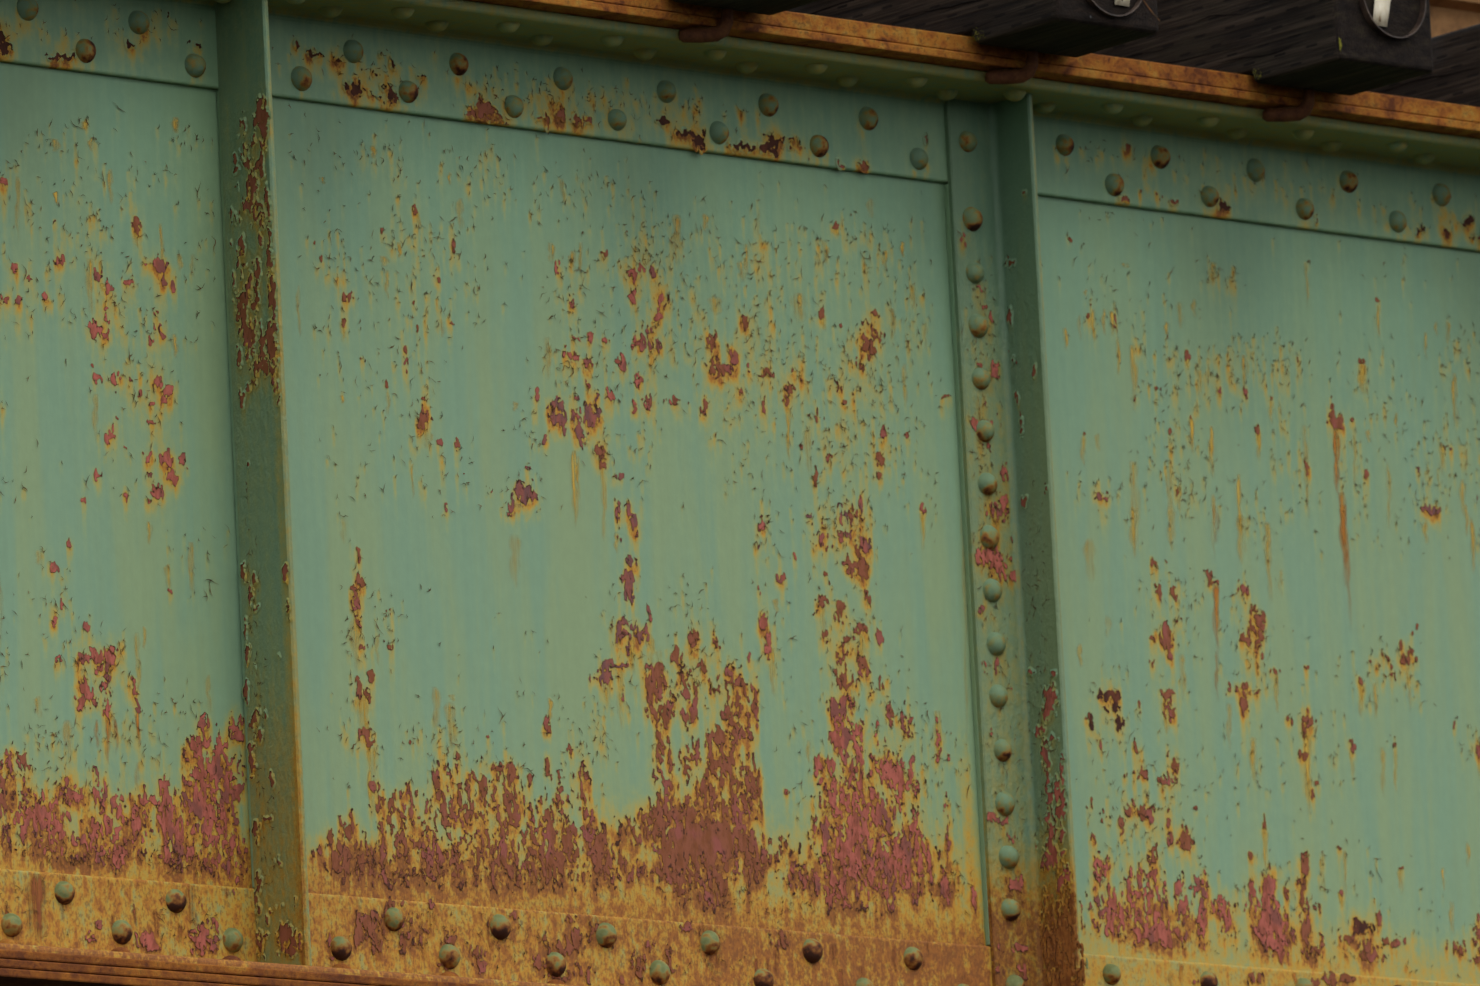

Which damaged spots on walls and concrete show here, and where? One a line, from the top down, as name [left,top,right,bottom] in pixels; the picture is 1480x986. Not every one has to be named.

rust [131,216,142,236]
peeling [229,93,282,411]
peeling [91,364,174,425]
peeling [104,416,188,504]
peeling [507,466,538,517]
rust [571,437,607,511]
rust [1326,395,1354,570]
peeling [1359,623,1419,685]
peeling [0,559,276,895]
peeling [311,495,952,985]
rust [29,875,45,933]
rust [1038,877,1088,986]